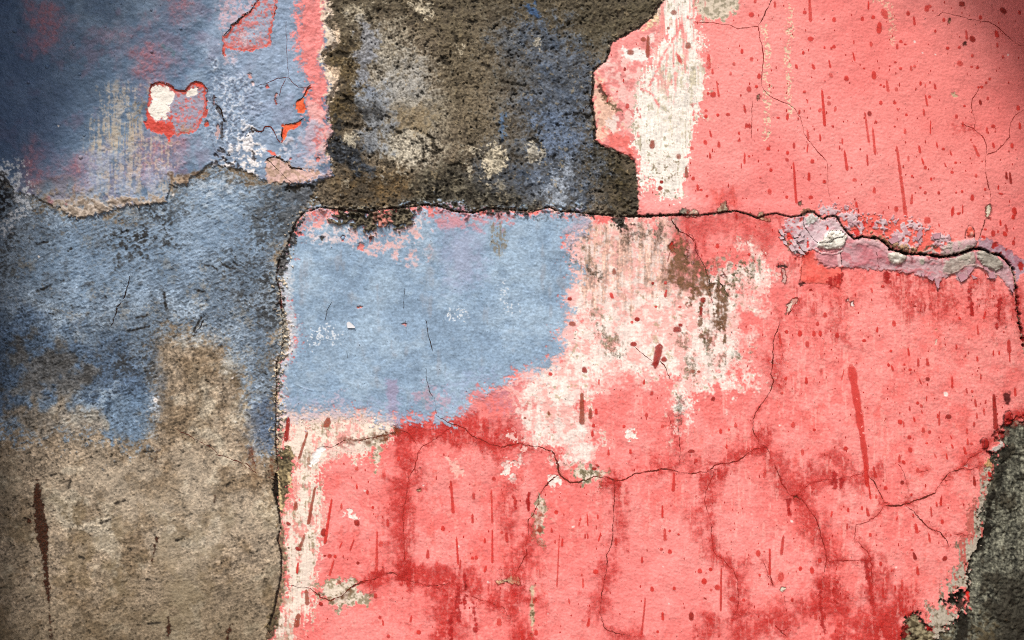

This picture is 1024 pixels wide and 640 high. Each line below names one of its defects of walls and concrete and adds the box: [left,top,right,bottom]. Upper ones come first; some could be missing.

peeling [144,82,221,142]
peeling [222,0,278,57]
crack [699,0,828,178]
spalling [265,0,1024,550]
crack [177,192,1024,639]
spalling [900,416,1024,640]